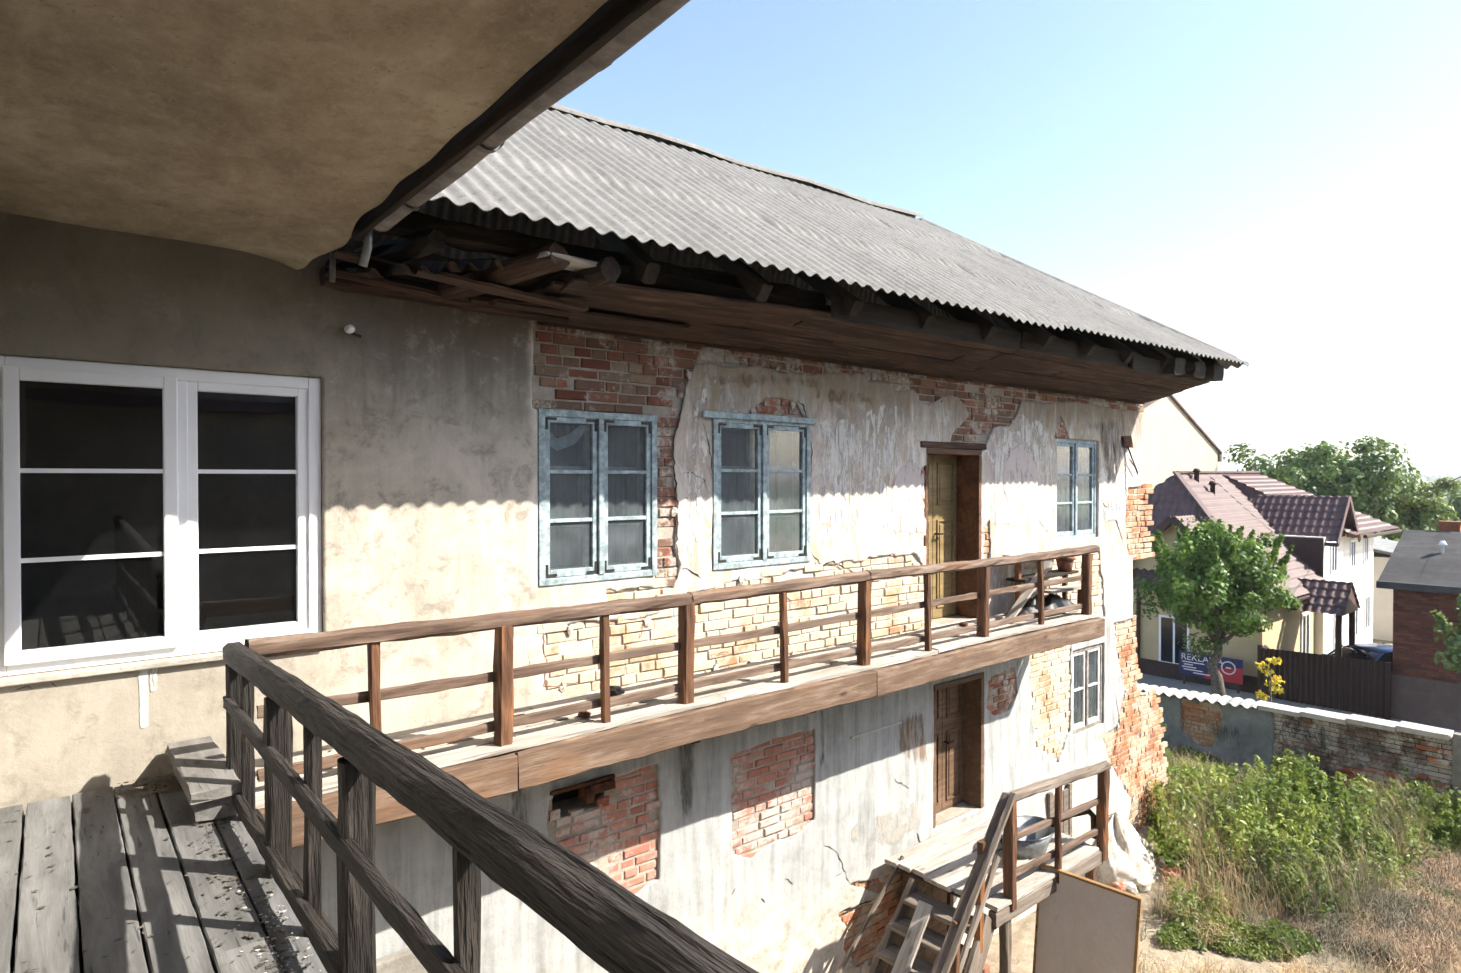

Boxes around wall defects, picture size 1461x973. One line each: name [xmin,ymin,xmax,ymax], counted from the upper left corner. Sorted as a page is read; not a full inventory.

flaking render [528,320,1144,701]
flaking render [1125,483,1155,560]
flaking render [547,764,660,894]
flaking render [731,730,815,858]
flaking render [986,645,1071,762]
flaking render [1010,543,1222,831]
flaking render [1273,712,1453,816]